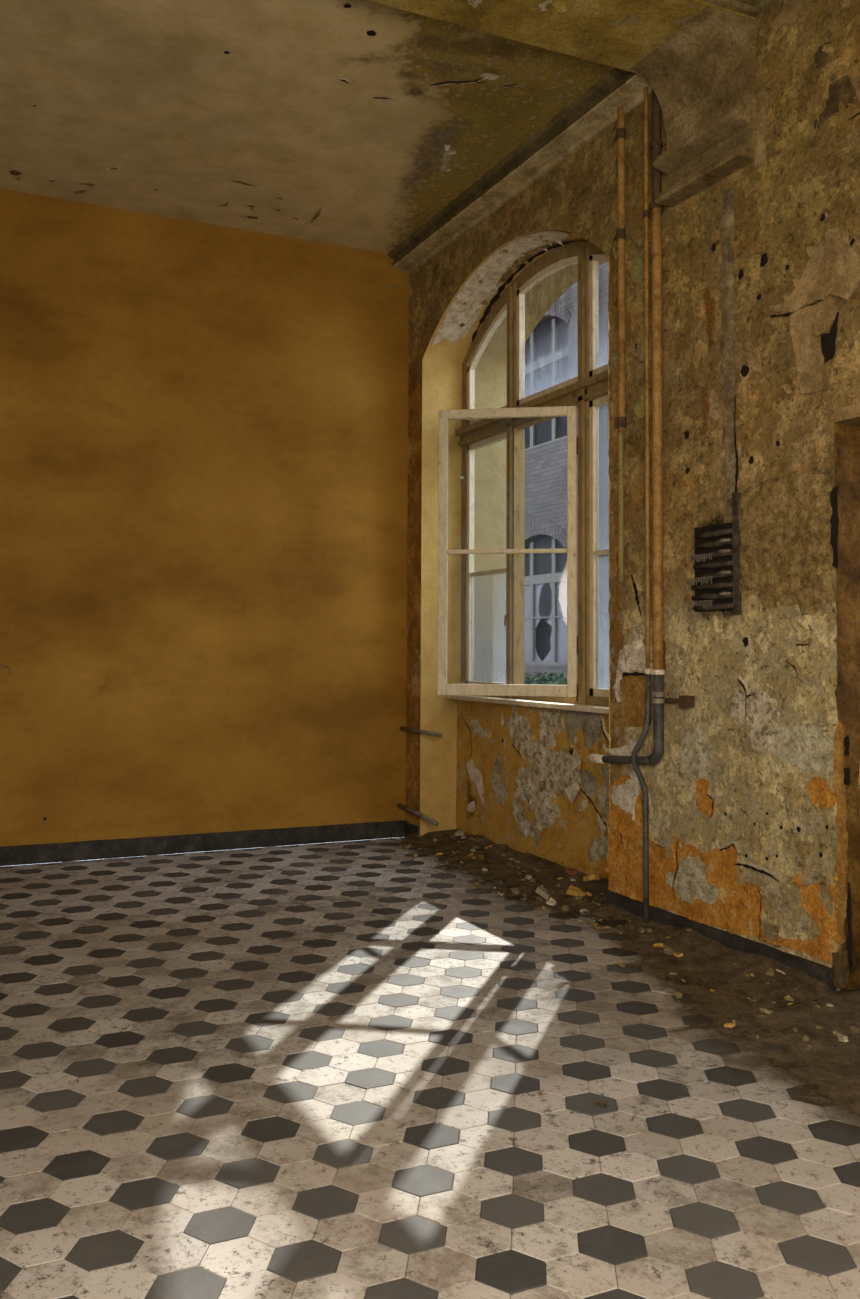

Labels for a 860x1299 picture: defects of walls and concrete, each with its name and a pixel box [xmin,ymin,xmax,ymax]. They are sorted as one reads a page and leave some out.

damp [392,9,615,247]
peeling [431,231,573,347]
flaking render [733,212,860,394]
spalling [613,632,653,703]
peeling [465,686,860,974]